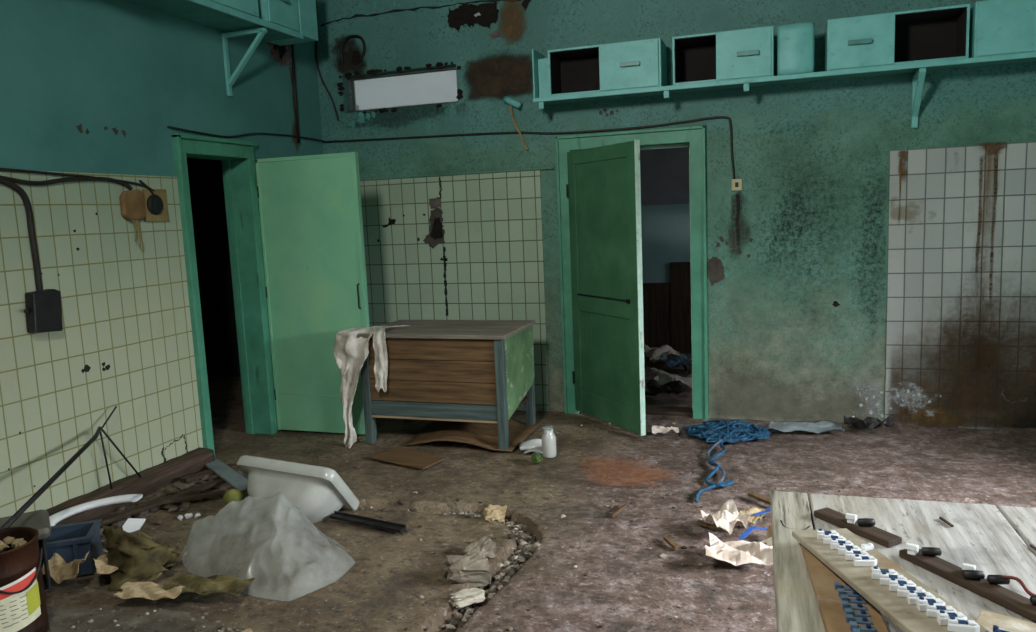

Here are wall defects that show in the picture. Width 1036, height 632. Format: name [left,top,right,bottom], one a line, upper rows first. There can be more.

spalling [447,2,502,39]
spalling [337,50,411,127]
rust [899,151,907,220]
spalling [417,197,445,248]
leakage [729,192,749,253]
rust [976,142,1006,303]
leakage [855,320,1036,428]